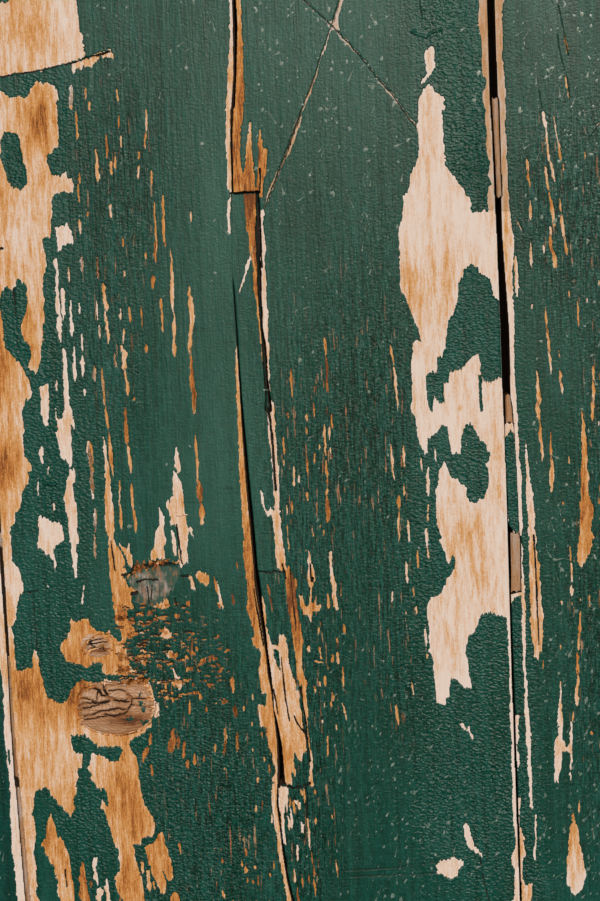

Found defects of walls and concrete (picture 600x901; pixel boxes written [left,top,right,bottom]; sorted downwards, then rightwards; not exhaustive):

crack [0,50,110,78]
peeling [227,0,268,355]
peeling [0,0,230,901]
peeling [398,0,544,901]
peeling [577,412,595,567]
crack [253,563,311,818]
peeling [567,809,586,895]